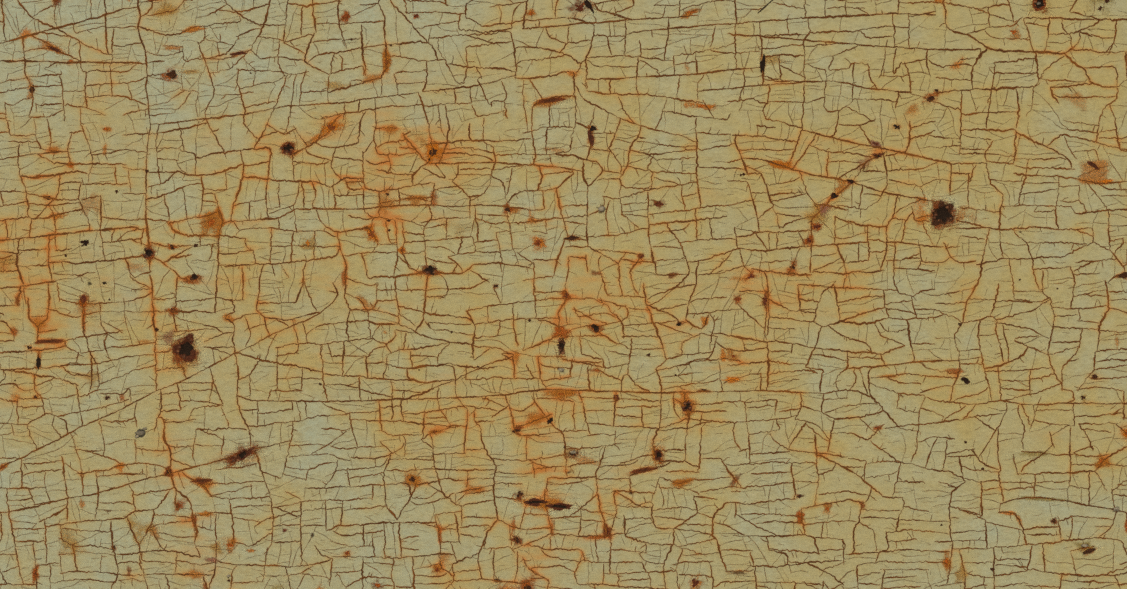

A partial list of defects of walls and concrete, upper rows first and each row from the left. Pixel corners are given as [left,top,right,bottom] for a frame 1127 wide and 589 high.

corrosion [194,209,225,247]
crack [0,313,14,342]
crack [751,469,788,477]
corrosion [517,491,561,511]
crack [146,573,209,589]
corrosion [494,575,534,589]
crack [853,563,928,589]